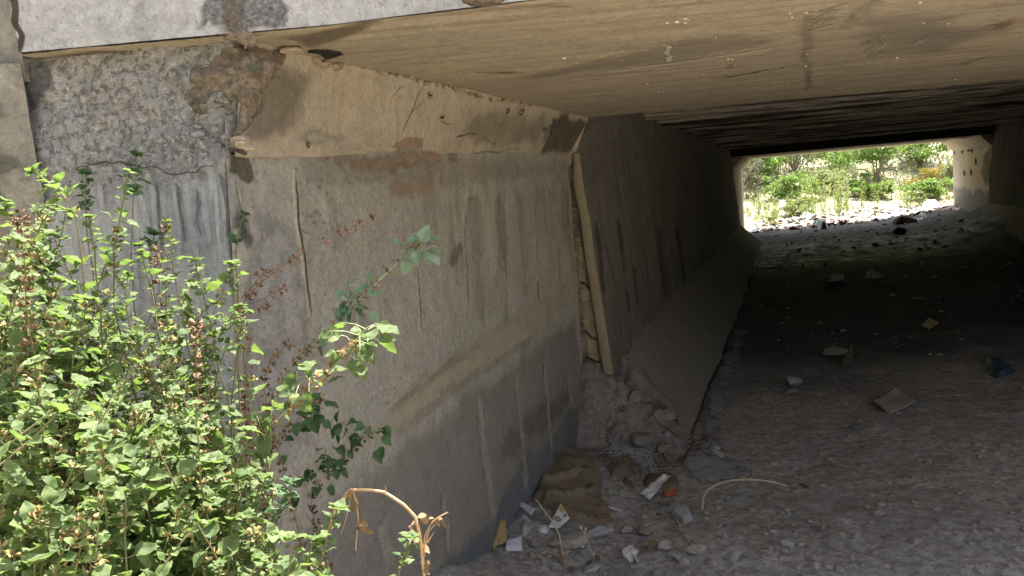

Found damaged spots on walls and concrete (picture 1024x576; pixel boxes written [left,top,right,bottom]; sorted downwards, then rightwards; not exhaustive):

spalling [190,107,255,155]
crack [442,121,523,154]
crack [74,161,215,175]
water stain [138,176,241,256]